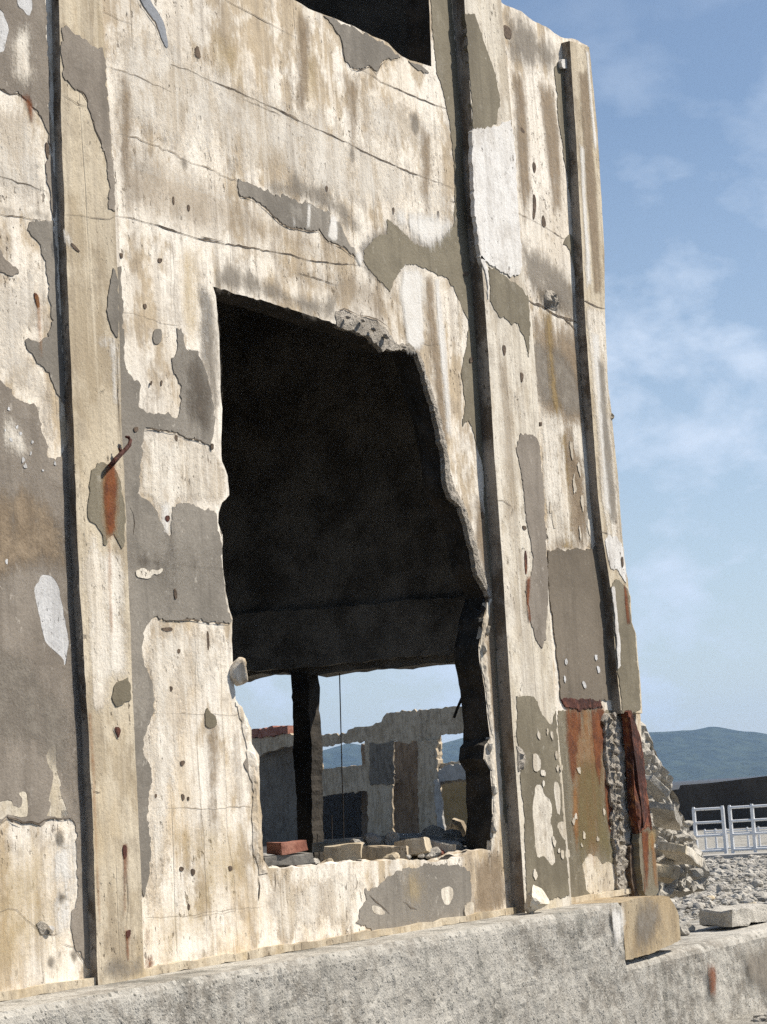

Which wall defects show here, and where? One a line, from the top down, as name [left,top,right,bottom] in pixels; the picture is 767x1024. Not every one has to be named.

flaking render [0,0,116,405]
crack [1,89,391,331]
crack [104,2,453,188]
rust [104,465,117,534]
flaking render [87,253,232,897]
flaking render [237,0,507,850]
flaking render [356,863,472,931]
flaking render [516,422,641,900]
rust [560,697,612,843]
rust [621,710,655,886]